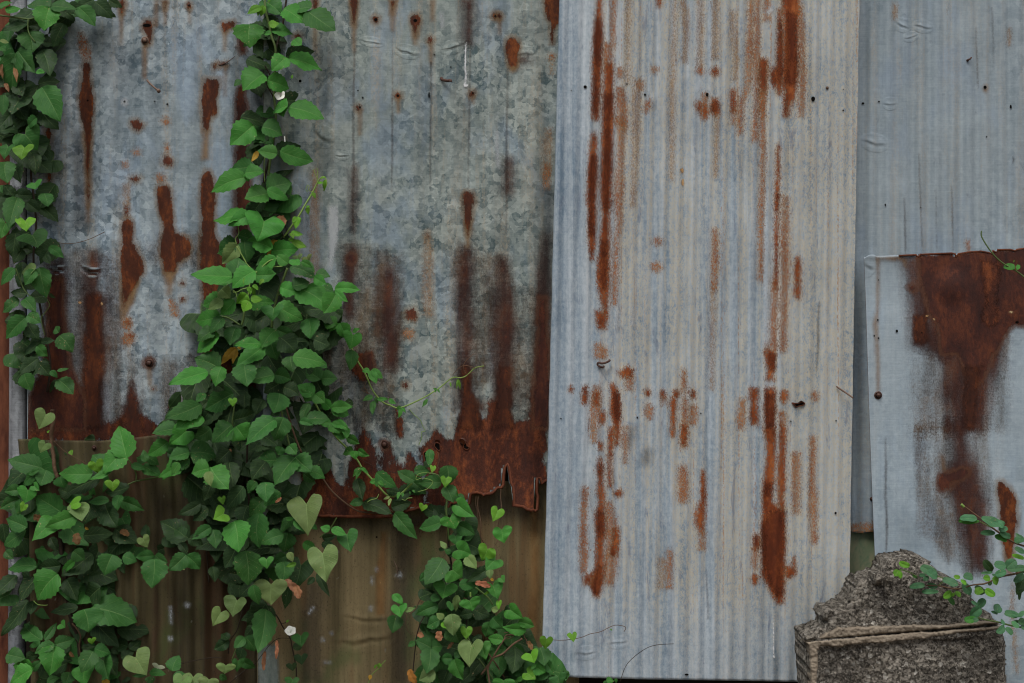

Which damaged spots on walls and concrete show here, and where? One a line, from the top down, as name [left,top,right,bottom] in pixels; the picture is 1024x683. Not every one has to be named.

rust [77,31,94,202]
rust [28,145,226,441]
rust [193,348,233,374]
rust [201,60,228,157]
rust [301,191,551,516]
rust [505,37,528,70]
rust [583,0,653,329]
rust [569,366,698,599]
rust [651,0,820,606]
rust [889,242,1024,573]